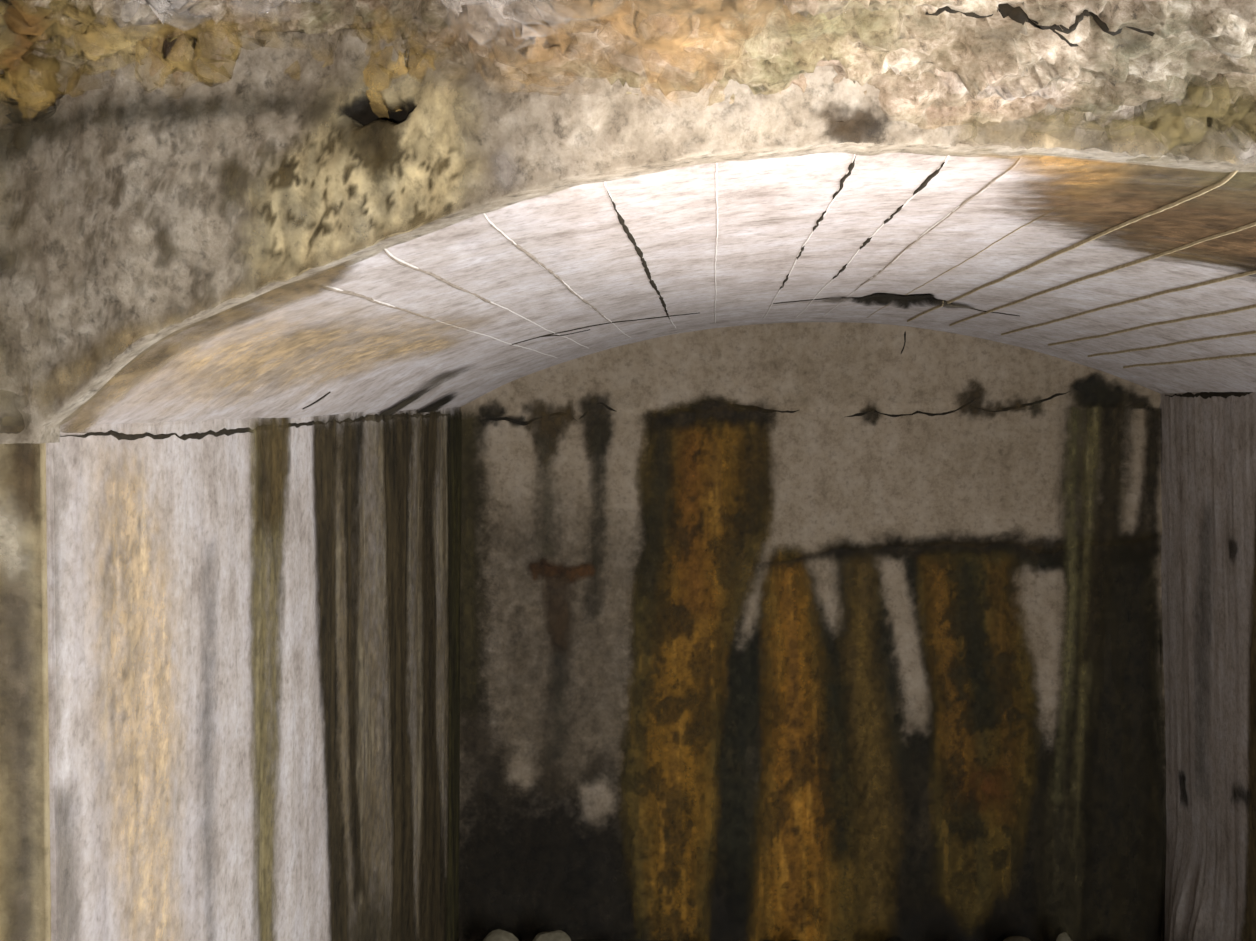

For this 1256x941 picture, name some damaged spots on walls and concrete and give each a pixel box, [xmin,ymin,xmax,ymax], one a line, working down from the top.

crack [492,187,698,345]
crack [780,155,856,289]
spalling [773,292,1019,316]
crack [833,157,1021,292]
crack [925,3,1155,47]
leakage [977,108,1256,271]
leakage [251,418,289,941]
leakage [314,396,639,941]
leakage [705,597,769,941]
corrosion [621,398,895,941]
leakage [772,374,1167,941]
corrosion [918,550,1036,929]